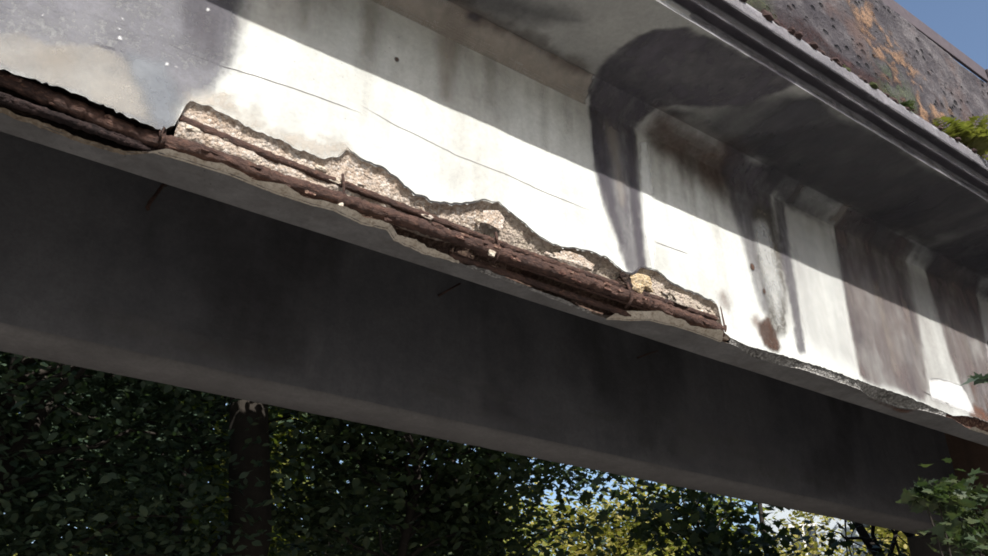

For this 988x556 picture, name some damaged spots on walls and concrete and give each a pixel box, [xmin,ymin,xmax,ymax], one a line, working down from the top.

damp [0,0,239,129]
spalling [0,69,730,343]
crack [222,66,586,209]
damp [372,0,988,416]
rust [760,318,780,350]
spalling [946,413,988,435]